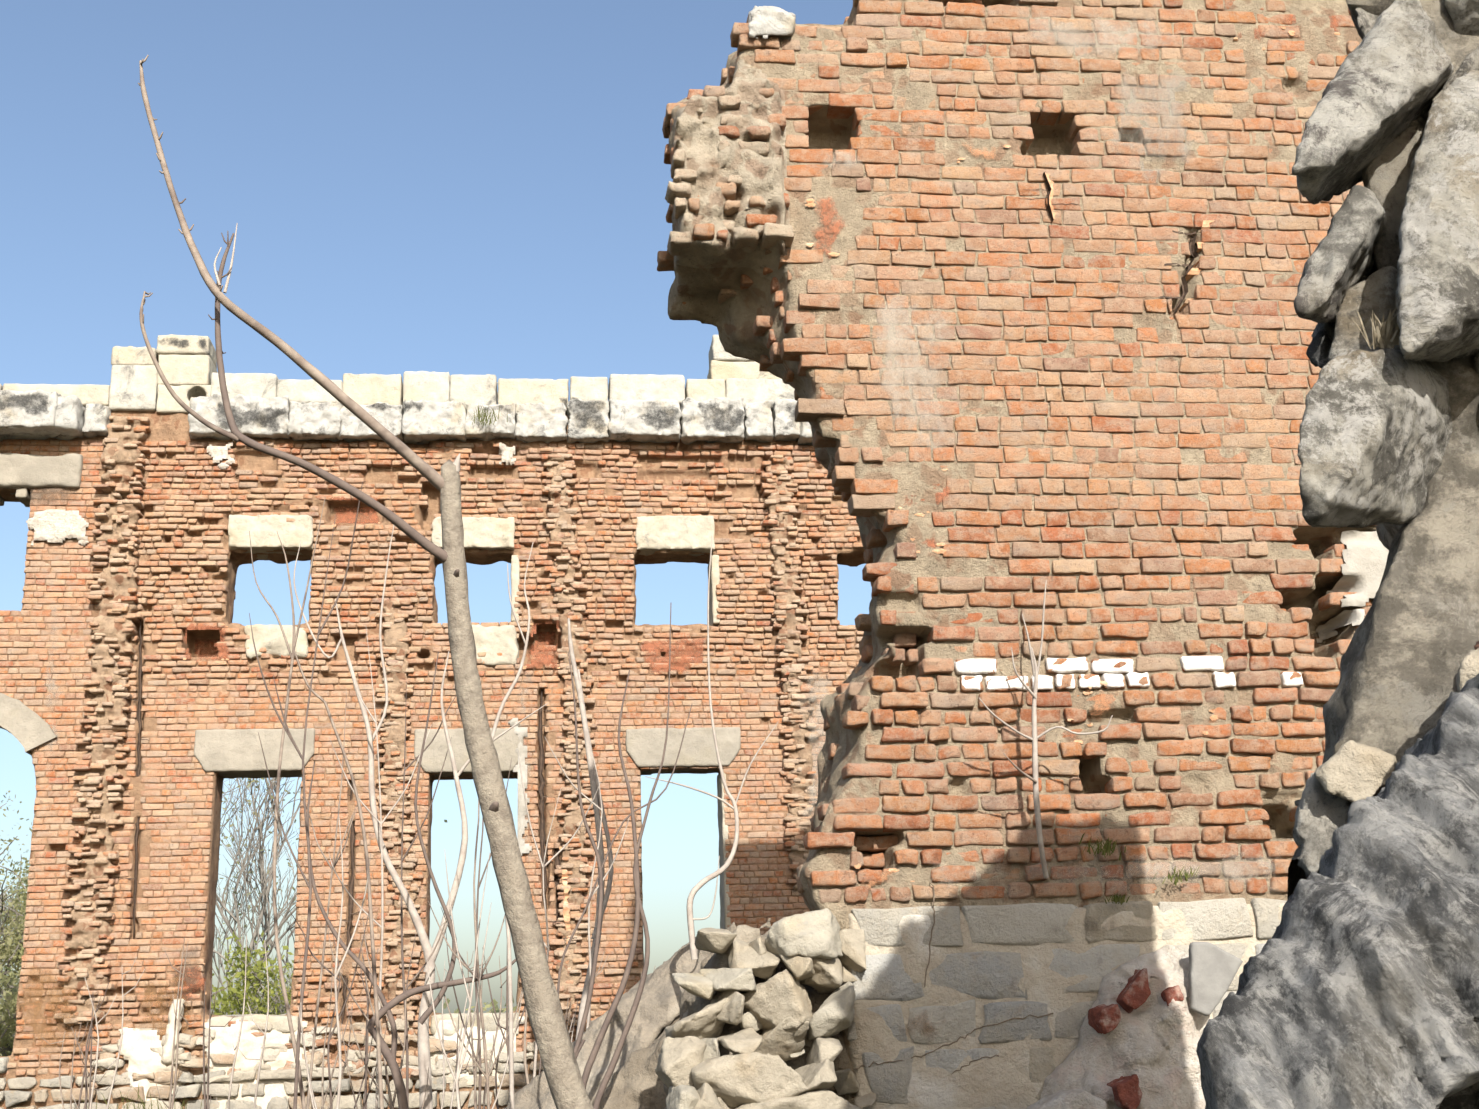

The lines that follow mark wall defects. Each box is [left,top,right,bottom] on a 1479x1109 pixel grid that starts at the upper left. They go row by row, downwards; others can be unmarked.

crack [1020,172,1078,222]
crack [1159,220,1215,314]
crack [122,620,148,777]
crack [119,817,139,939]
spalling [854,864,914,888]